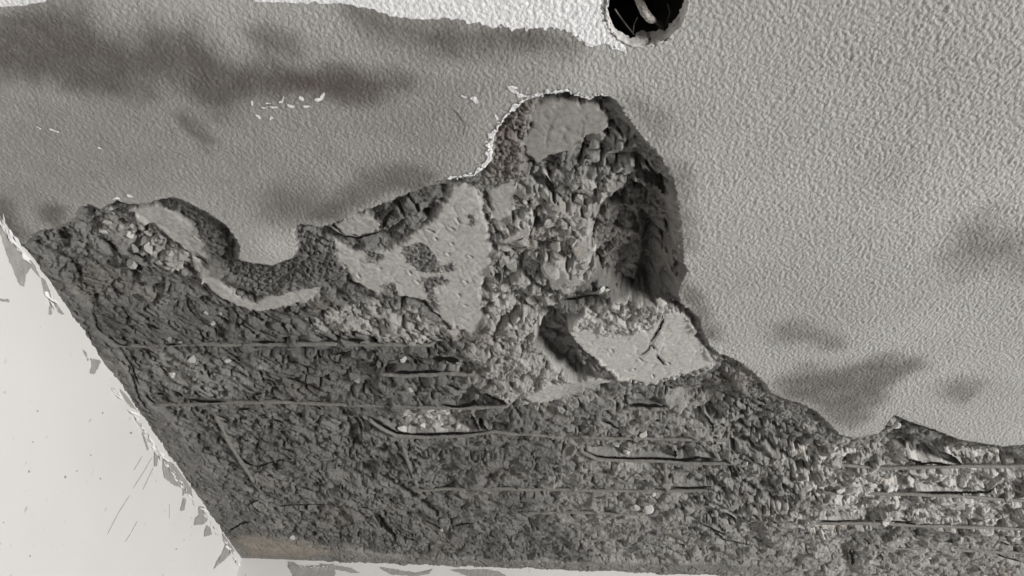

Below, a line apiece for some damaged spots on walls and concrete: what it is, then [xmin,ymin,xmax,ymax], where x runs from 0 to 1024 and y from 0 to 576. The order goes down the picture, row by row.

damp [0,16,360,101]
peeling [463,129,498,177]
peeling [0,214,32,264]
spalling [379,365,476,379]
spalling [153,399,349,407]
spalling [404,402,511,410]
spalling [626,403,669,412]
spalling [368,417,565,444]
spalling [214,415,263,492]
spalling [578,447,731,484]
spalling [868,492,1006,501]
spalling [889,522,1024,531]